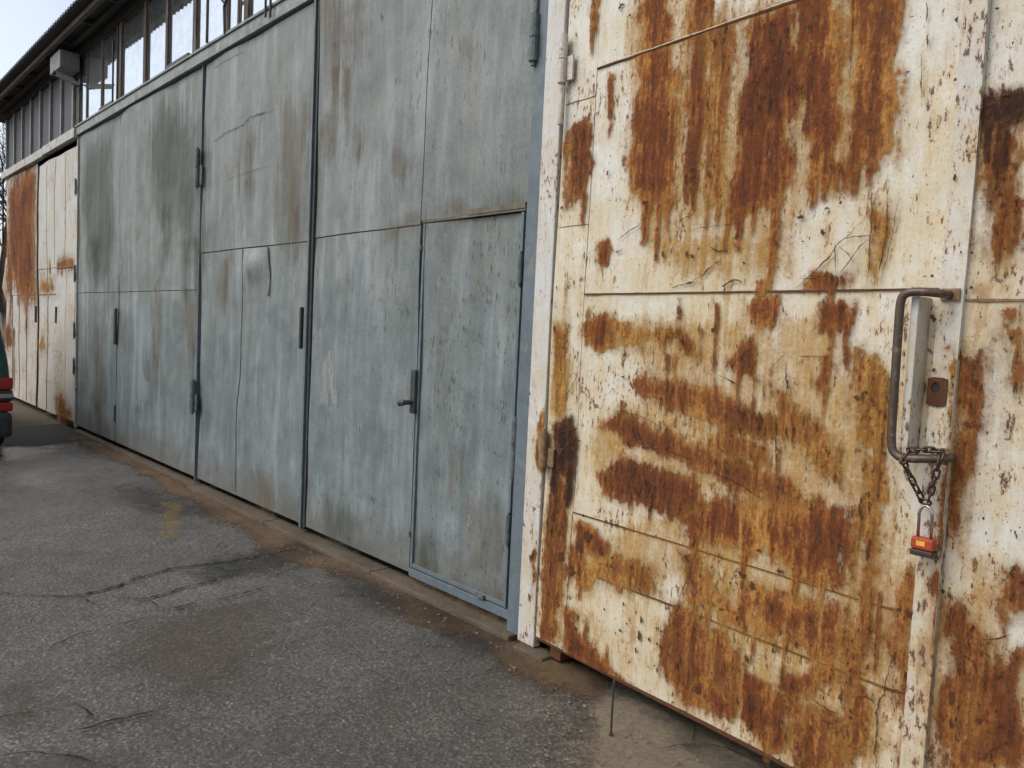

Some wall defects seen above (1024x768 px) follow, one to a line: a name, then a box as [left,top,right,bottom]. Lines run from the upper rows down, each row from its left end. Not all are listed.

corrosion [3,166,74,379]
corrosion [975,87,1024,276]
corrosion [55,393,73,423]
corrosion [531,0,915,768]
corrosion [937,305,1024,545]
corrosion [929,563,1024,768]